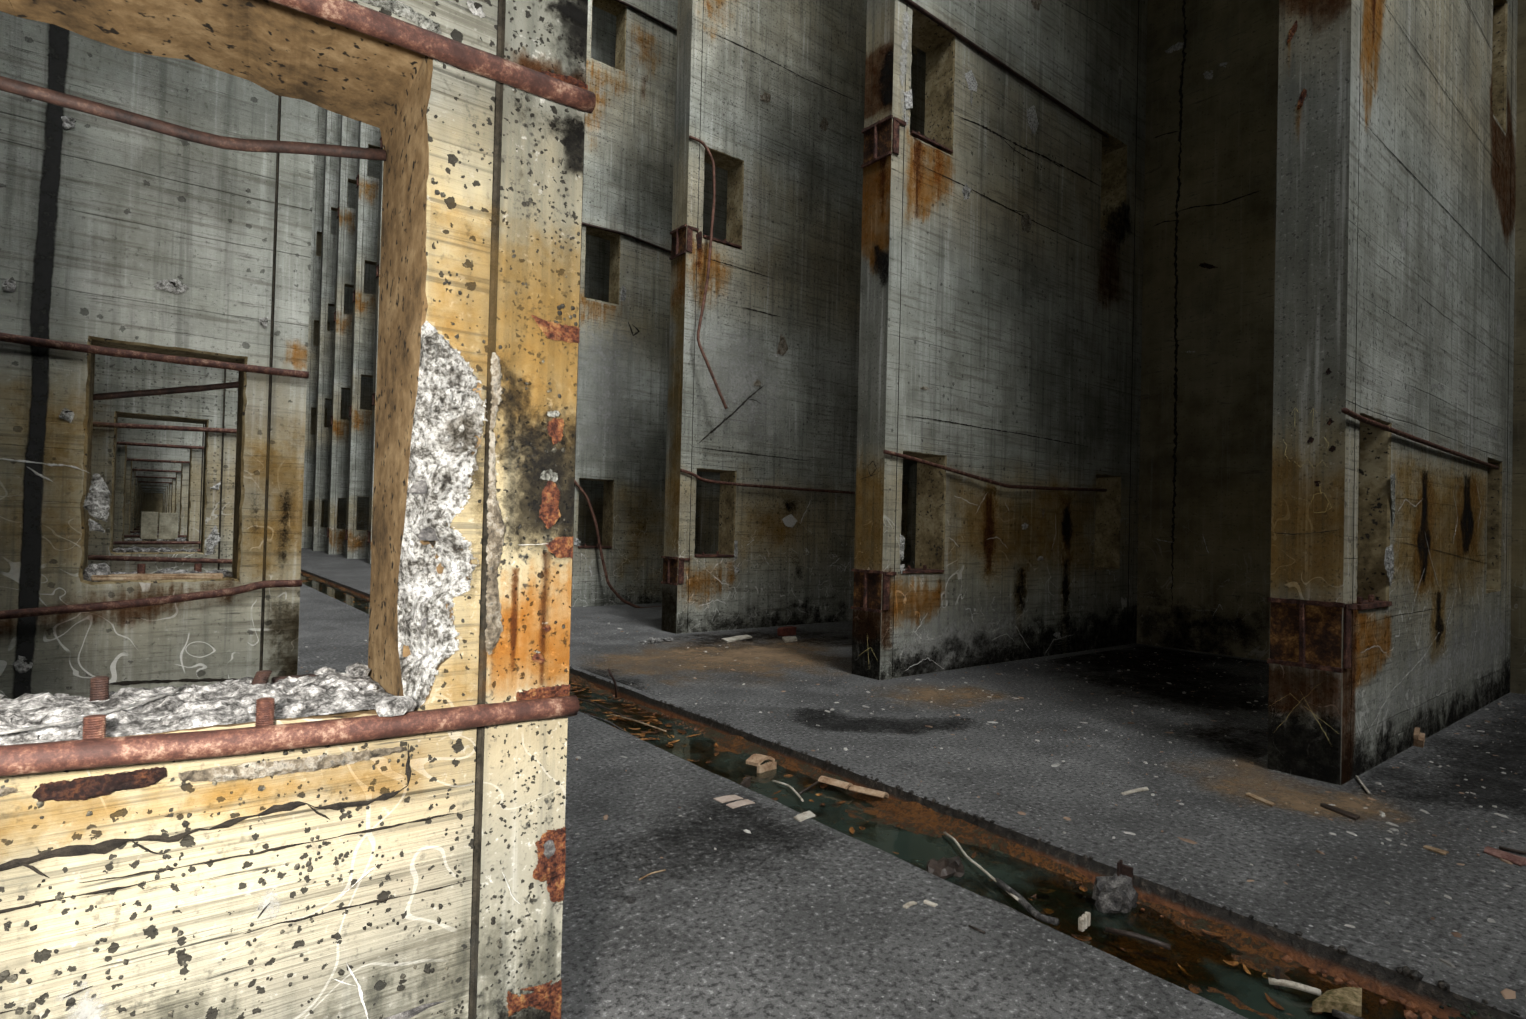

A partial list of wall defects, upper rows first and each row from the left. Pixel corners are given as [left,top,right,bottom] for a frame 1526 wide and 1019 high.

corrosion [1491,86,1516,235]
crack [1155,0,1261,608]
spalling [398,321,506,708]
leakage [1418,476,1430,582]
leakage [1460,476,1474,551]
leakage [621,642,814,670]
corrosion [532,827,566,902]
corrosion [506,979,562,1019]